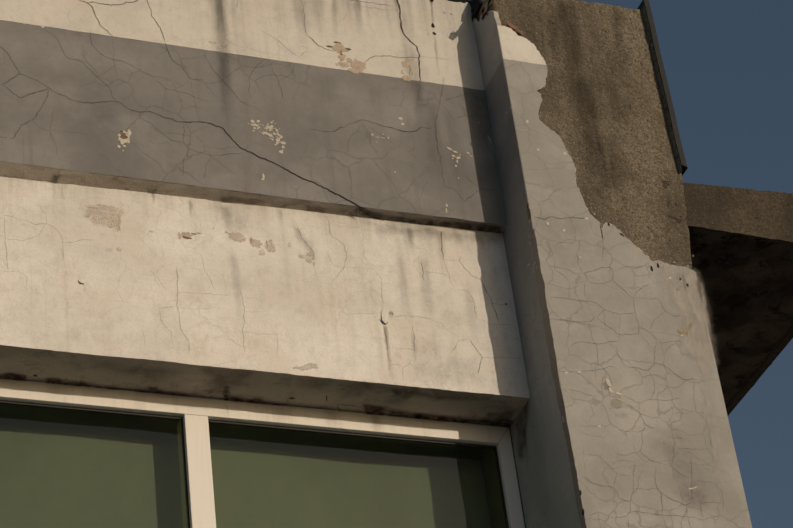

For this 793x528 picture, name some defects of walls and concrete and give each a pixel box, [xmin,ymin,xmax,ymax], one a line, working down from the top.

crack [80,0,165,40]
peeling [327,42,366,74]
crack [367,0,421,81]
spalling [117,129,131,151]
peeling [248,120,286,153]
flaking render [471,0,693,269]
crack [149,111,365,210]